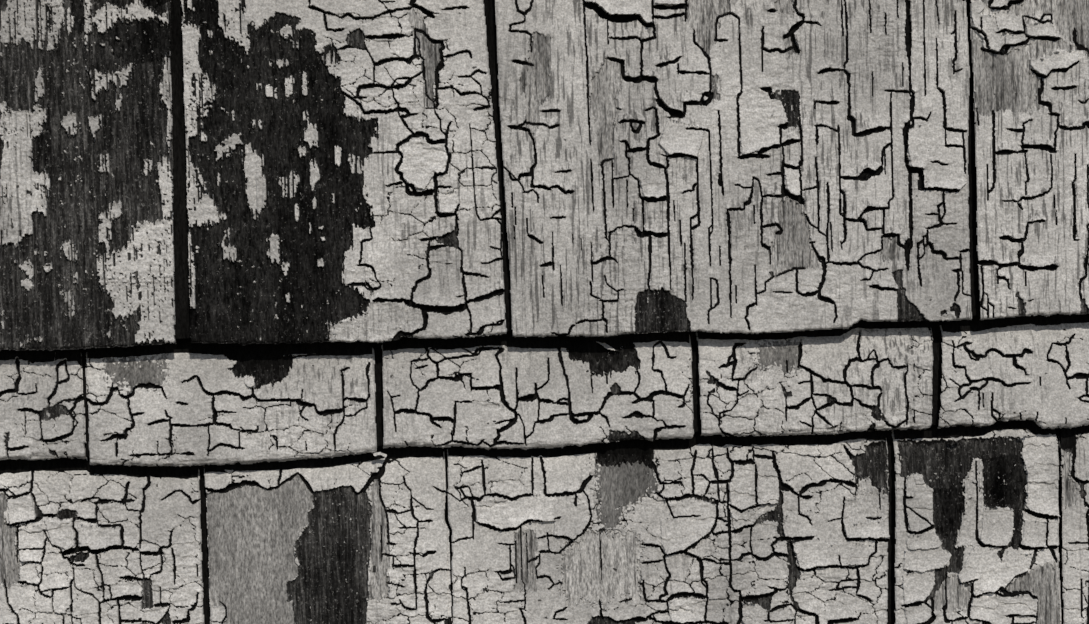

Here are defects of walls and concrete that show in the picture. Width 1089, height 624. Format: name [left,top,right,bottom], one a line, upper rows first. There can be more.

peeling [0,0,326,366]
peeling [399,137,457,214]
crack [308,0,574,359]
crack [552,0,1089,336]
peeling [634,287,691,334]
crack [1046,329,1089,403]
peeling [287,479,392,624]
crack [0,332,1067,624]
peeling [476,494,650,624]
peeling [730,434,1089,624]
crack [963,461,1089,624]
crack [1060,435,1089,485]